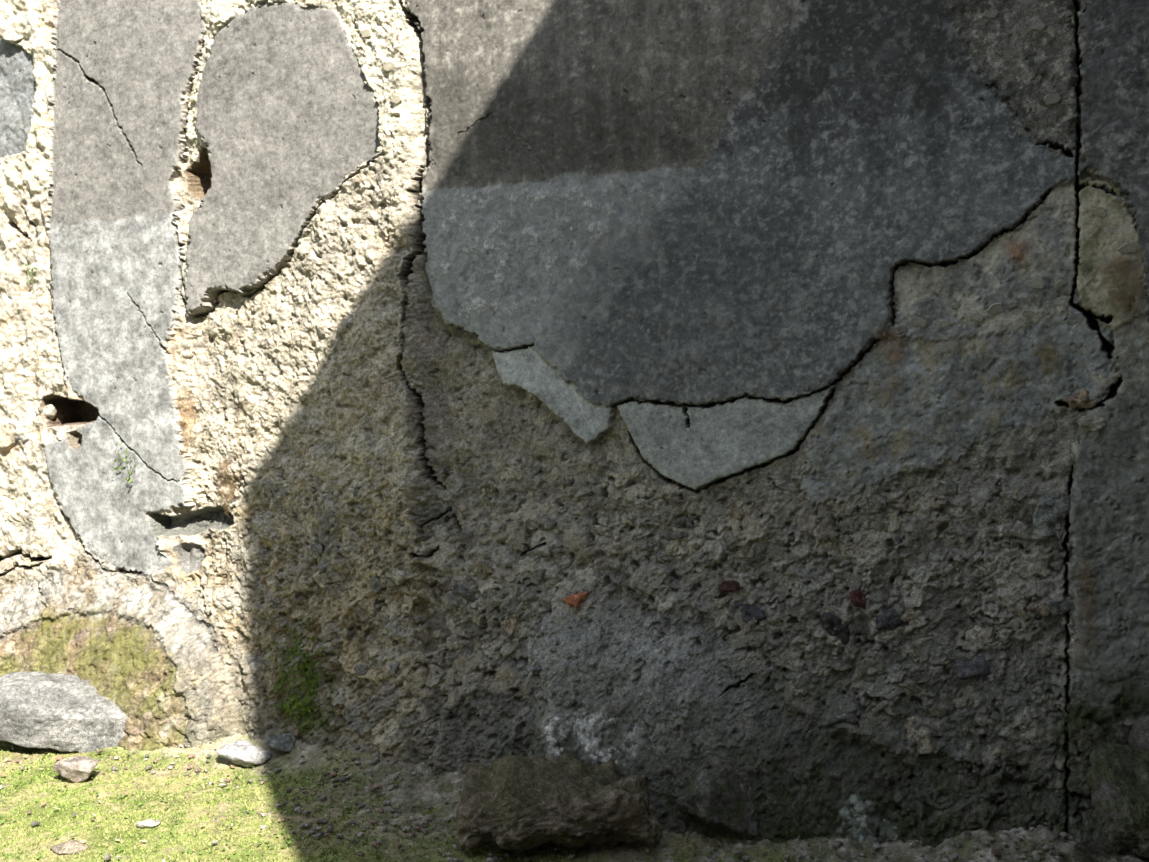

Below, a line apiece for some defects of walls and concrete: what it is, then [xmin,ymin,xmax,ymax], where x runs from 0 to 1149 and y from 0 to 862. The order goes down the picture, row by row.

spalling [0,0,87,576]
spalling [156,0,432,766]
crack [397,0,425,69]
crack [417,419,446,489]
spalling [411,253,1149,848]
peeling [873,0,1148,346]
crack [1063,623,1071,833]
crack [1037,0,1124,412]